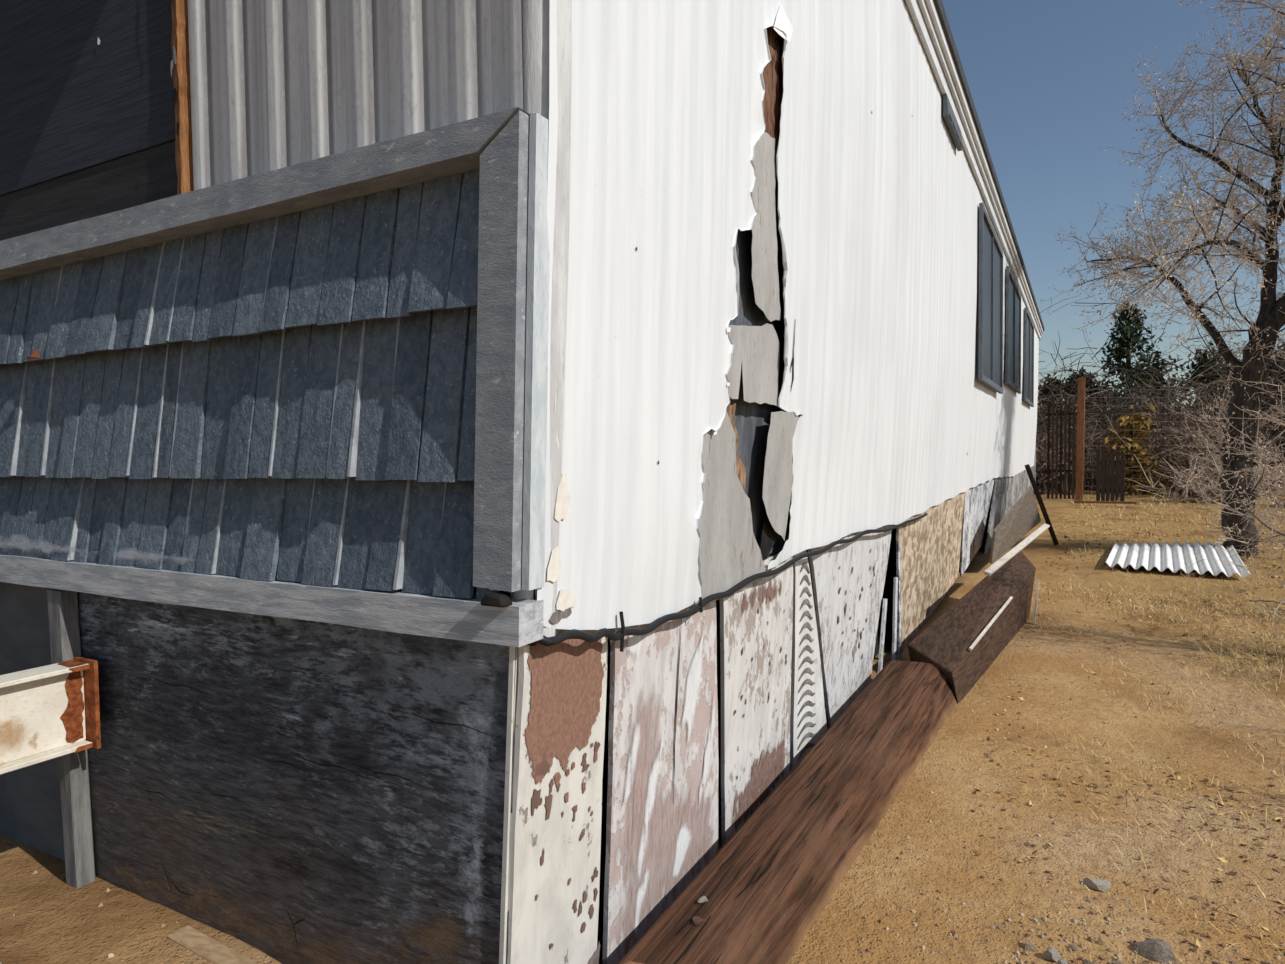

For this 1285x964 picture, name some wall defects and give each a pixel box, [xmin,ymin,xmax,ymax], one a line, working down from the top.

corrosion [58,660,93,753]
peeling [547,546,575,624]
peeling [524,637,607,841]
peeling [627,625,642,658]
peeling [624,698,715,952]
peeling [682,635,703,741]
peeling [732,737,788,831]
peeling [737,580,785,614]
peeling [573,866,598,933]
peeling [588,942,600,964]